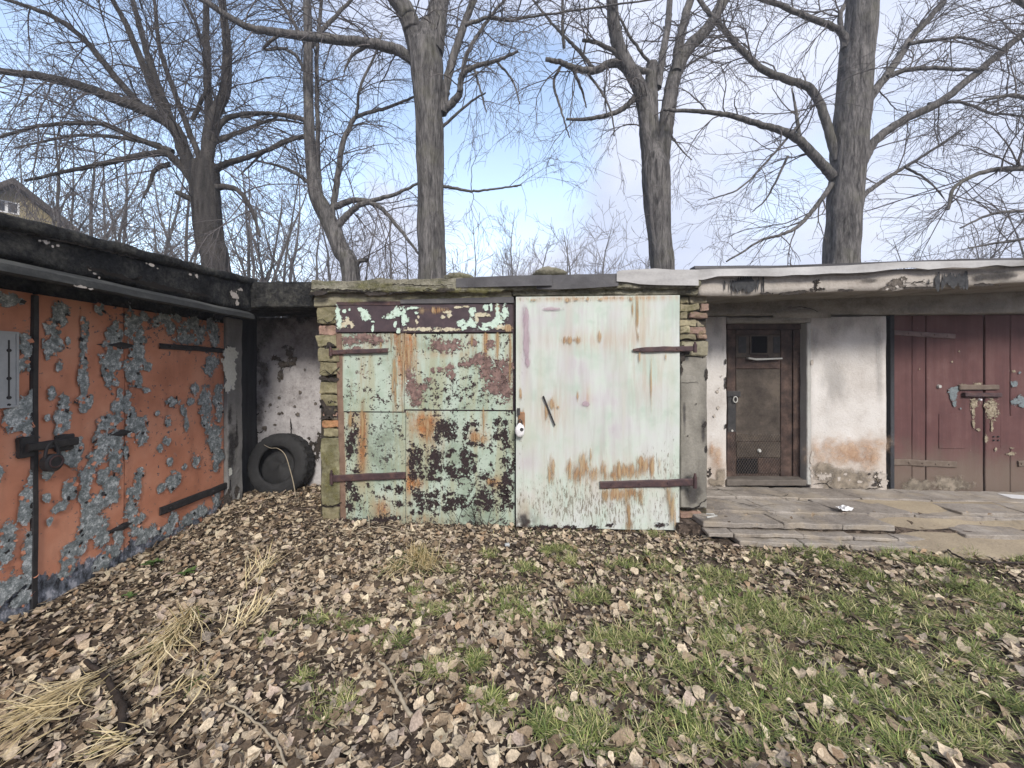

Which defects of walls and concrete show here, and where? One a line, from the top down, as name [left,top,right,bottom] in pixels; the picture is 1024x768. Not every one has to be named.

peeling [0,290,27,308]
spalling [760,279,825,295]
spalling [880,276,936,291]
corrosion [380,332,403,401]
peeling [324,292,530,407]
corrosion [471,325,512,378]
peeling [948,370,1024,456]
peeling [0,300,240,613]
peeling [338,417,516,524]
corrosion [548,450,654,530]
corrosion [667,489,676,525]
leakage [813,442,883,490]